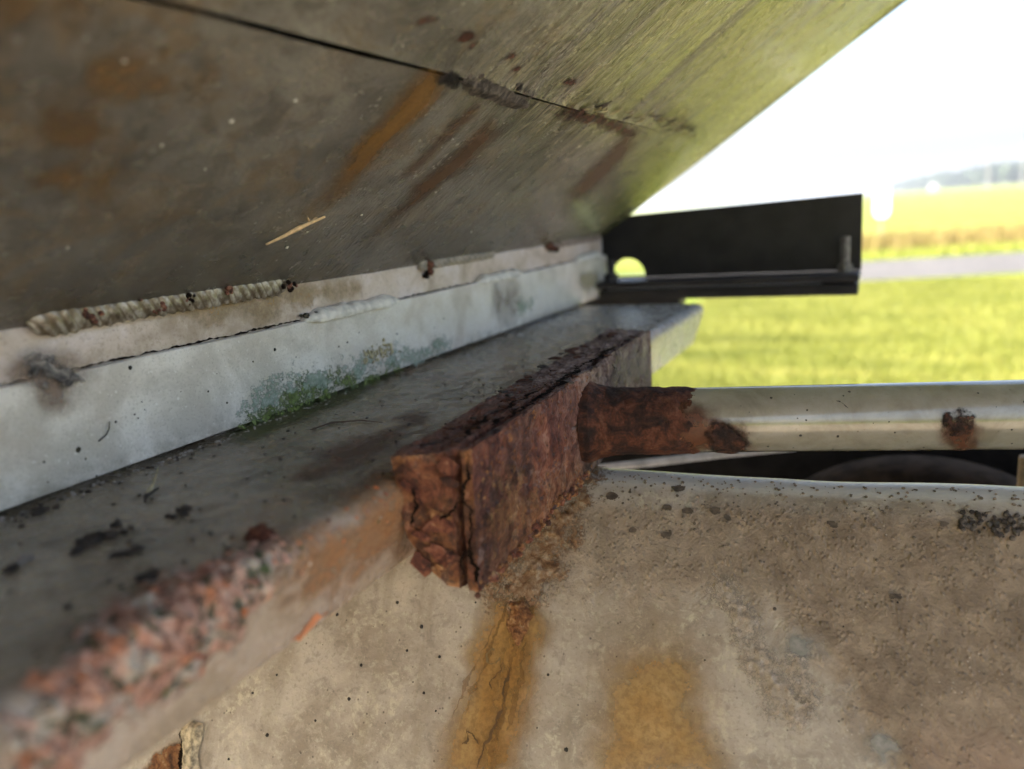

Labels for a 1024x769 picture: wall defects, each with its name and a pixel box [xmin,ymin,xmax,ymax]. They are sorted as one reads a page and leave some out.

corrosion [332,69,439,192]
corrosion [942,409,977,451]
corrosion [399,330,652,769]
crack [462,663,510,767]